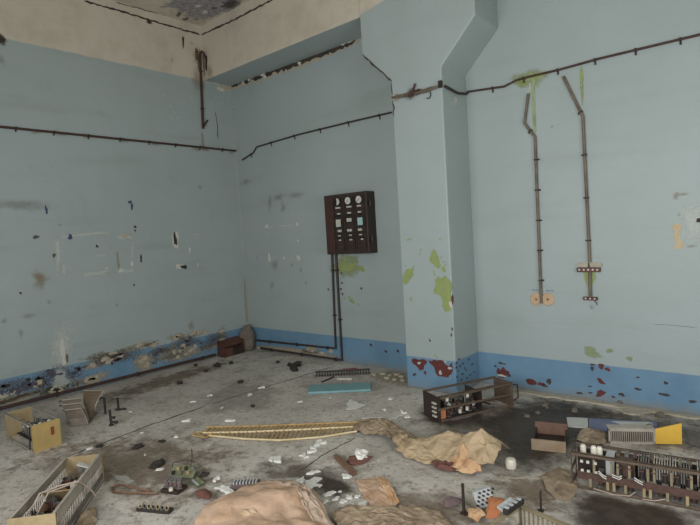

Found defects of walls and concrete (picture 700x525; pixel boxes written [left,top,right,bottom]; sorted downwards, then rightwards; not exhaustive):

leakage [165,0,240,20]
flaking render [217,39,359,92]
crack [363,55,396,116]
peeling [0,325,227,406]
peeling [370,354,475,385]
peeling [494,362,511,378]
flaking render [516,364,700,450]